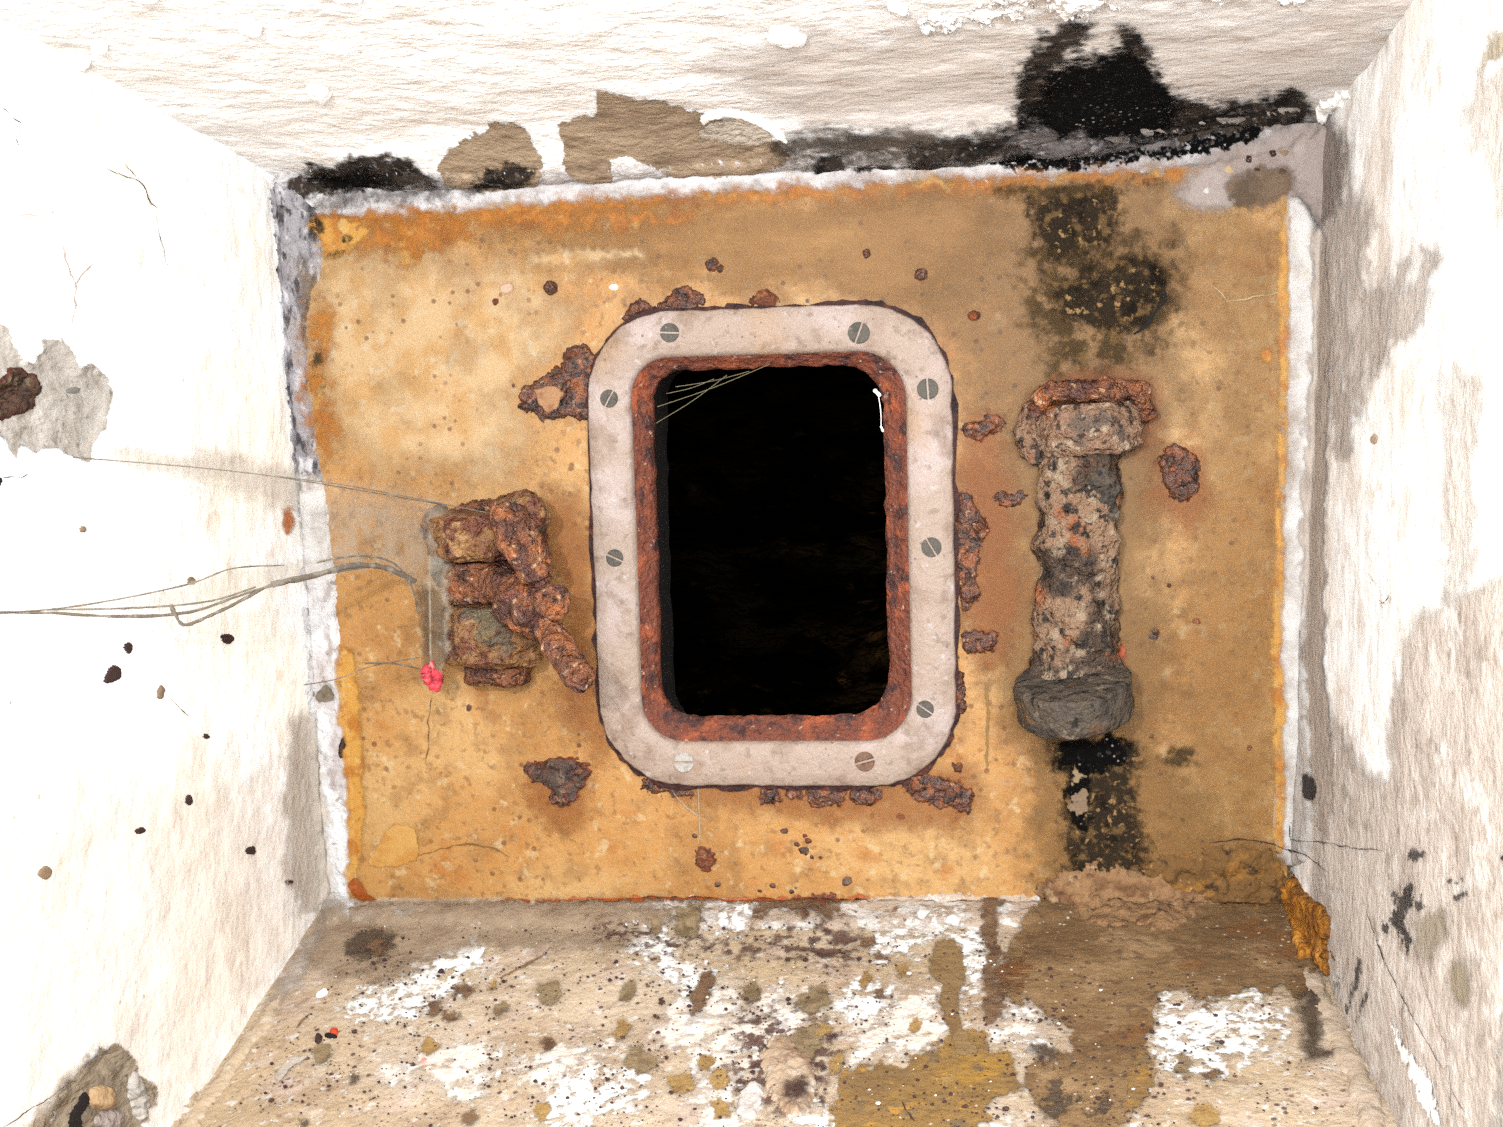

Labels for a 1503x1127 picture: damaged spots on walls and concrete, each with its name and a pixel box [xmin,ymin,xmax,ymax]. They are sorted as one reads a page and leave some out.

damp [710,0,1413,175]
damp [287,153,476,209]
peeling [437,122,543,193]
peeling [557,91,791,184]
flaking render [0,325,113,462]
rust [419,504,448,588]
rust [482,493,509,511]
rust [512,285,1044,820]
damp [791,131,1503,1127]
flaking render [45,1043,158,1127]